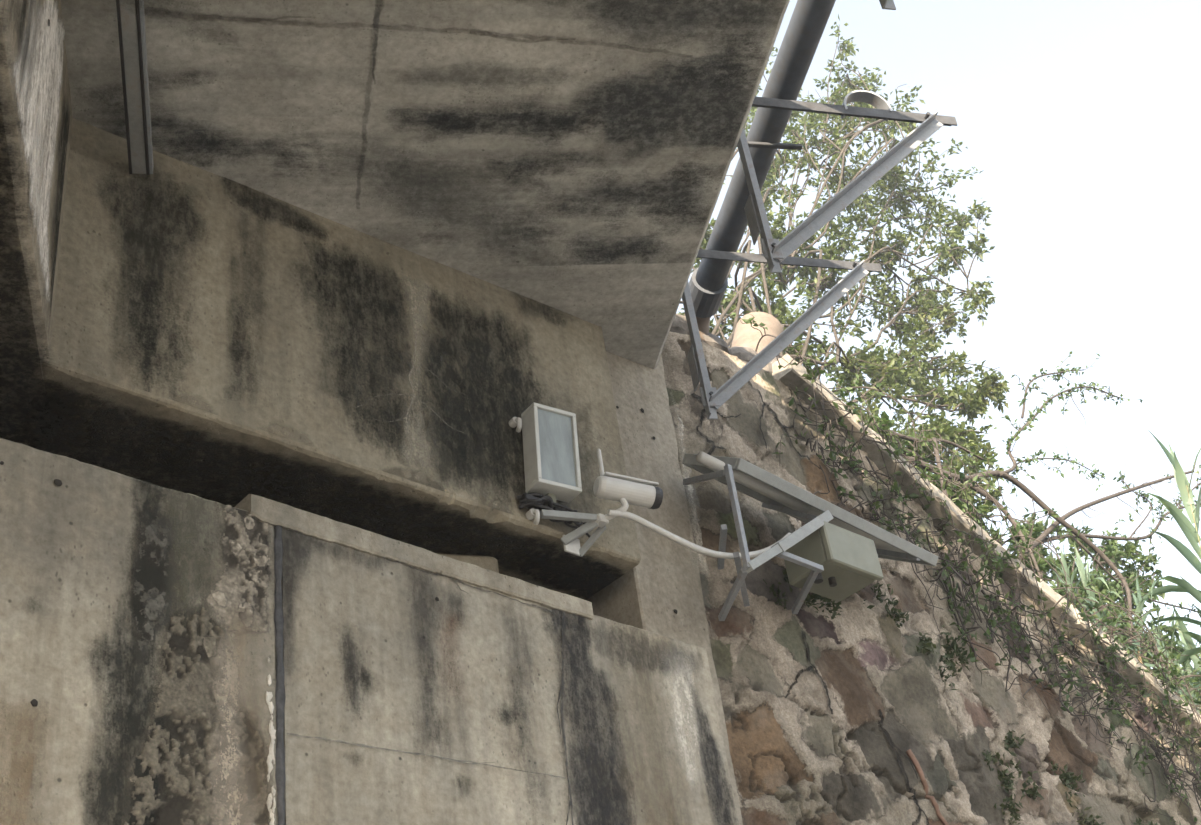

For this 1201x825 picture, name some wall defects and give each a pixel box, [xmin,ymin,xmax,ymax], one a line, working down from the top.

damp [402,0,780,156]
damp [545,171,704,223]
damp [0,0,633,825]
spalling [121,504,276,825]
damp [669,655,736,825]